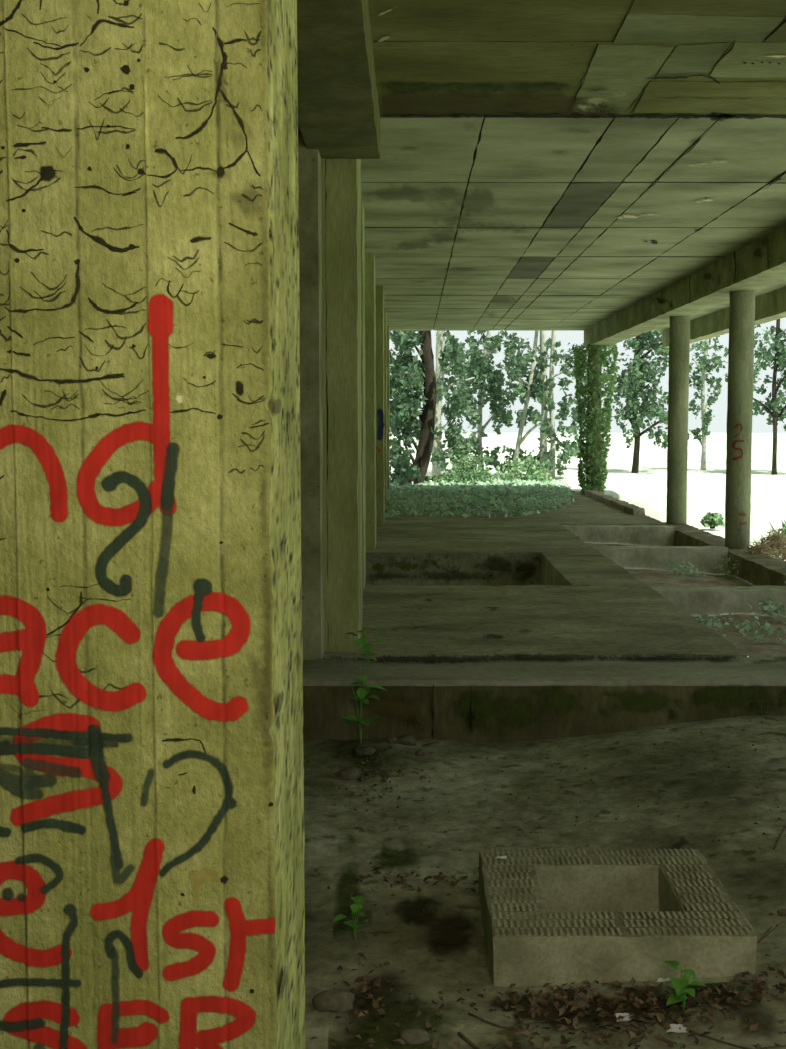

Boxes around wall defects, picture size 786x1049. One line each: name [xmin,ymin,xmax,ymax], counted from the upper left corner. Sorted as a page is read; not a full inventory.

crack [0,0,269,473]
crack [43,580,130,662]
crack [10,668,127,715]
crack [162,738,207,753]